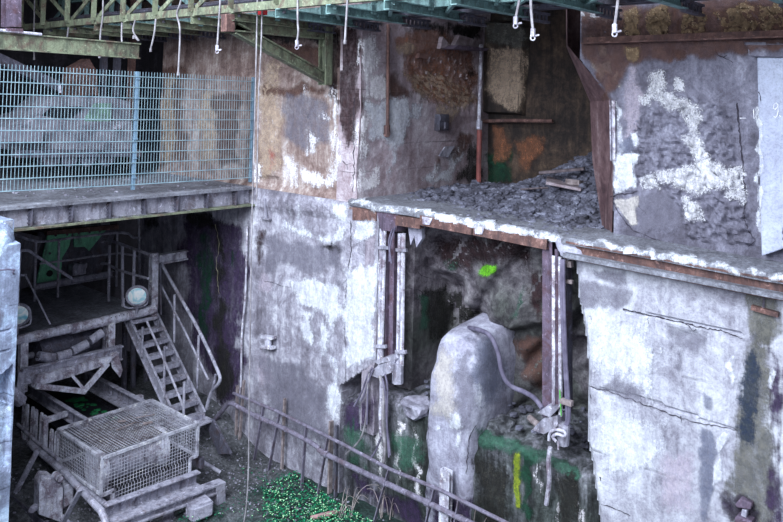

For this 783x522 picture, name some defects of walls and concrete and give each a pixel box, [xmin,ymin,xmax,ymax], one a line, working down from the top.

rust [396,29,478,106]
rust [581,0,783,98]
damp [350,35,422,213]
rust [492,126,543,170]
crack [736,103,755,247]
damp [409,208,562,242]
damp [177,211,250,406]
damp [255,205,376,449]
peeling [579,270,631,308]
crack [623,308,742,339]
crack [590,386,736,430]
damp [713,294,783,522]